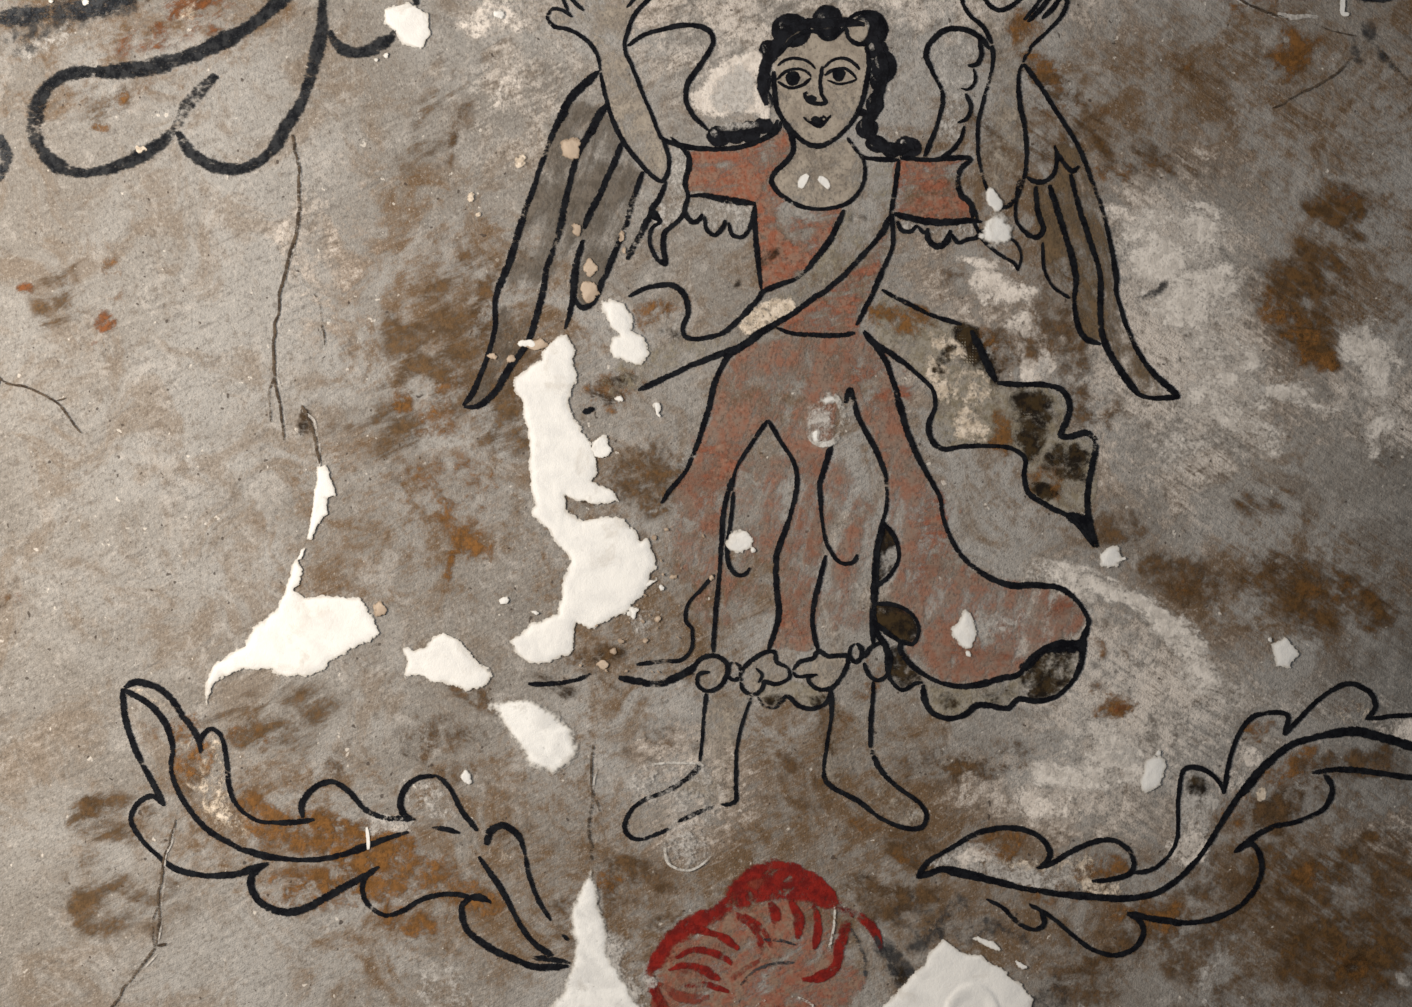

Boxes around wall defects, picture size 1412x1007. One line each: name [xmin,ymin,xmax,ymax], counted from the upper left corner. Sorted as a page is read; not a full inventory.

flaking render [374,2,430,62]
flaking render [560,137,581,160]
crack [268,135,325,466]
flaking render [580,258,649,365]
flaking render [487,335,682,672]
flaking render [205,465,387,704]
flaking render [403,633,492,692]
flaking render [488,700,578,774]
flaking render [461,770,472,785]
peeling [418,966,487,1007]
flaking render [550,871,657,1007]
flaking render [882,936,1033,1007]